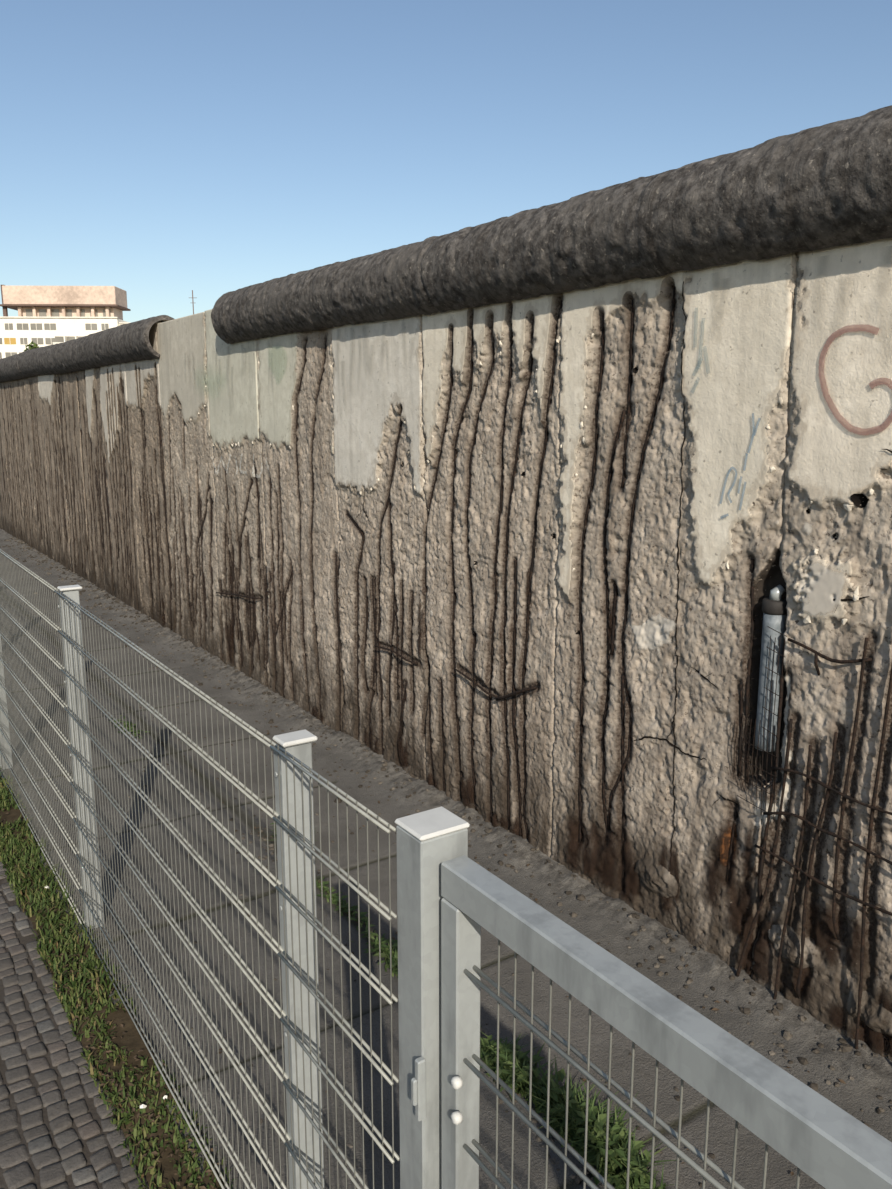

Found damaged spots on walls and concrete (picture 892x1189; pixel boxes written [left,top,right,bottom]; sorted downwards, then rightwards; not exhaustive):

crack [632,281,717,865]
spalling [0,252,892,1038]
corrosion [397,732,408,767]
corrosion [707,828,778,983]
corrosion [809,905,861,969]
corrosion [829,1006,892,1055]
corrosion [880,992,892,1013]